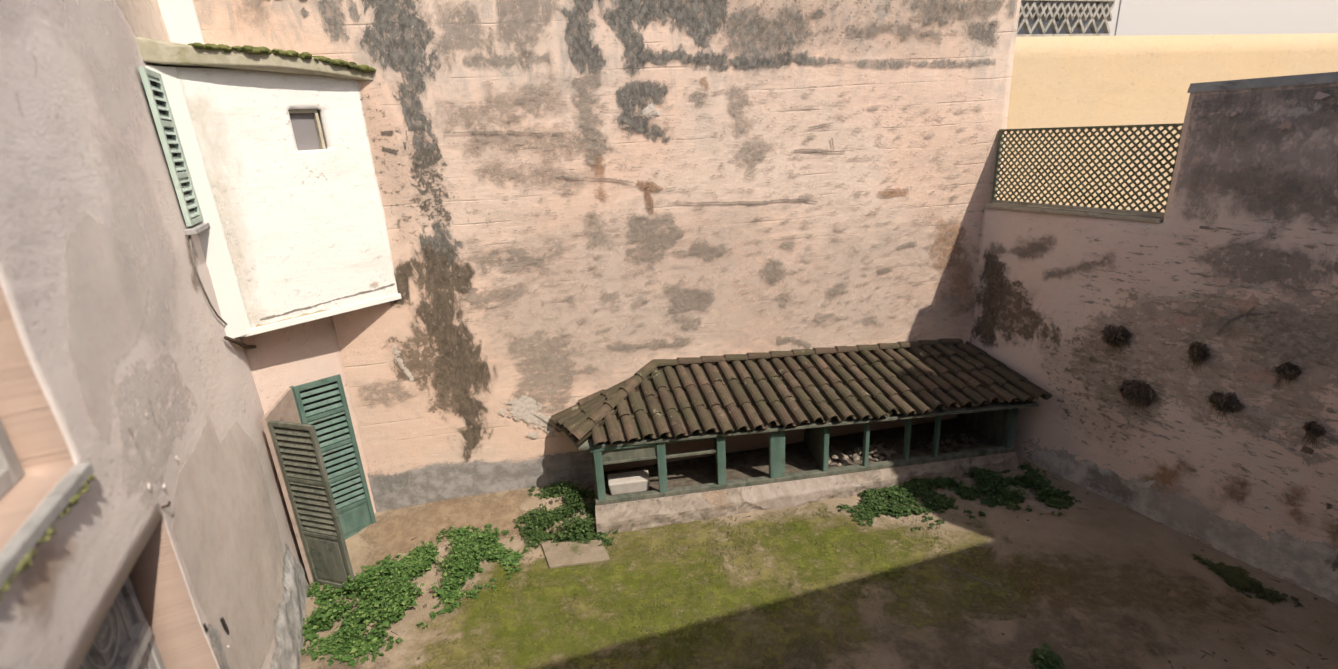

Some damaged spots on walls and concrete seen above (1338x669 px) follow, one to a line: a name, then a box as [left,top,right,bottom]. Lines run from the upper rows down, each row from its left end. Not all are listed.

damp [1174,83,1338,227]
damp [318,0,1018,512]
damp [970,237,1061,351]
damp [1044,257,1111,279]
damp [1199,236,1338,290]